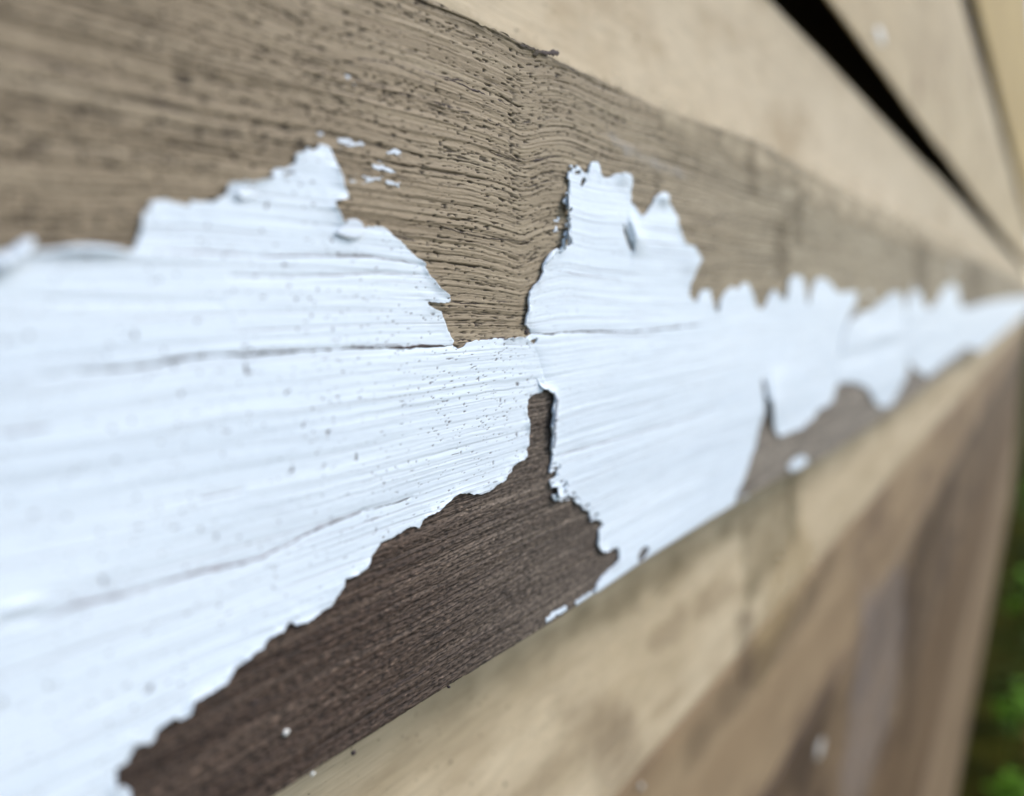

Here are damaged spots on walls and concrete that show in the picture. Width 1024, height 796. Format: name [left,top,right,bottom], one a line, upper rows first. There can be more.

peeling [0,144,546,796]
crack [0,325,699,382]
peeling [524,161,1024,593]